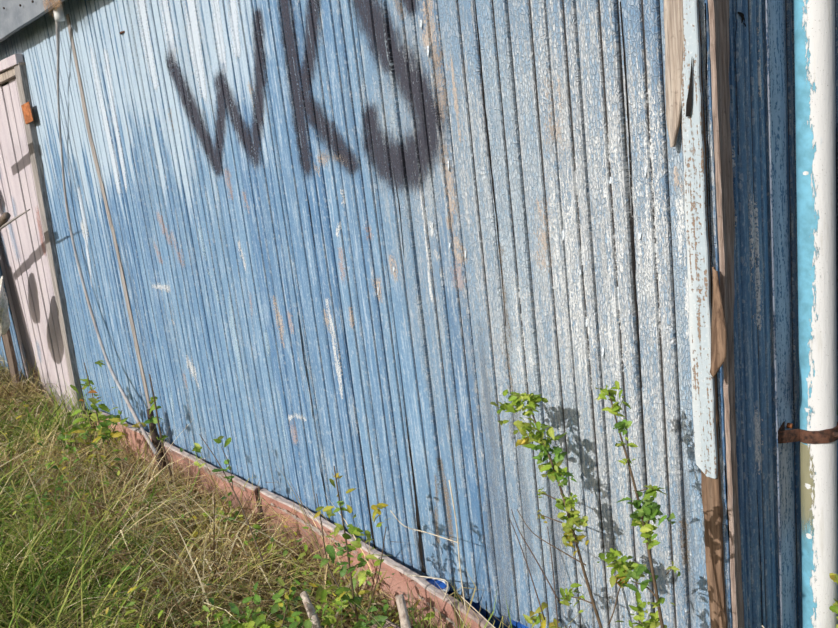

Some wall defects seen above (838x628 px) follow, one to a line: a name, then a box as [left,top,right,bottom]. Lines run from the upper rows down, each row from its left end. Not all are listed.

crack [398,353,425,573]
peeling [504,268,538,432]
peeling [534,69,687,388]
peeling [748,191,764,330]
peeling [754,406,763,475]
peeling [802,0,837,431]
peeling [804,441,838,628]